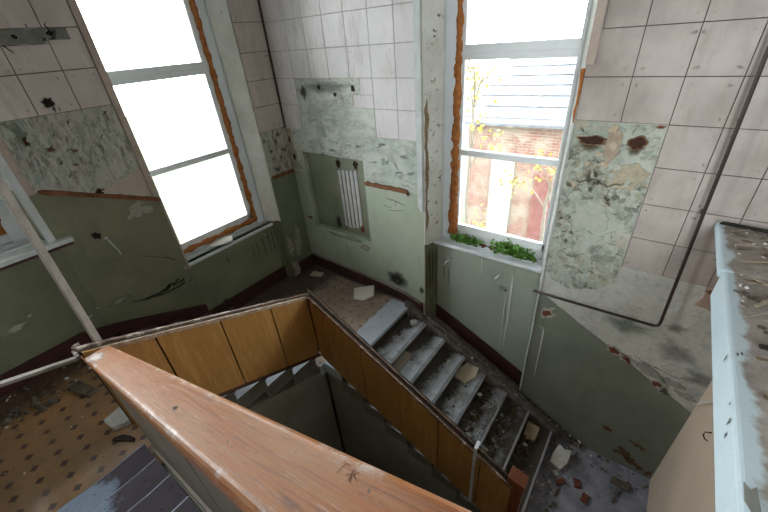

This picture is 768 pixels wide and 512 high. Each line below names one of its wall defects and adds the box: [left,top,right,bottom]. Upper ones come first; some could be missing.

peeling [0,97,153,220]
flaking render [260,78,442,231]
peeling [544,120,667,289]
crack [130,278,186,304]
flaking render [607,344,637,365]